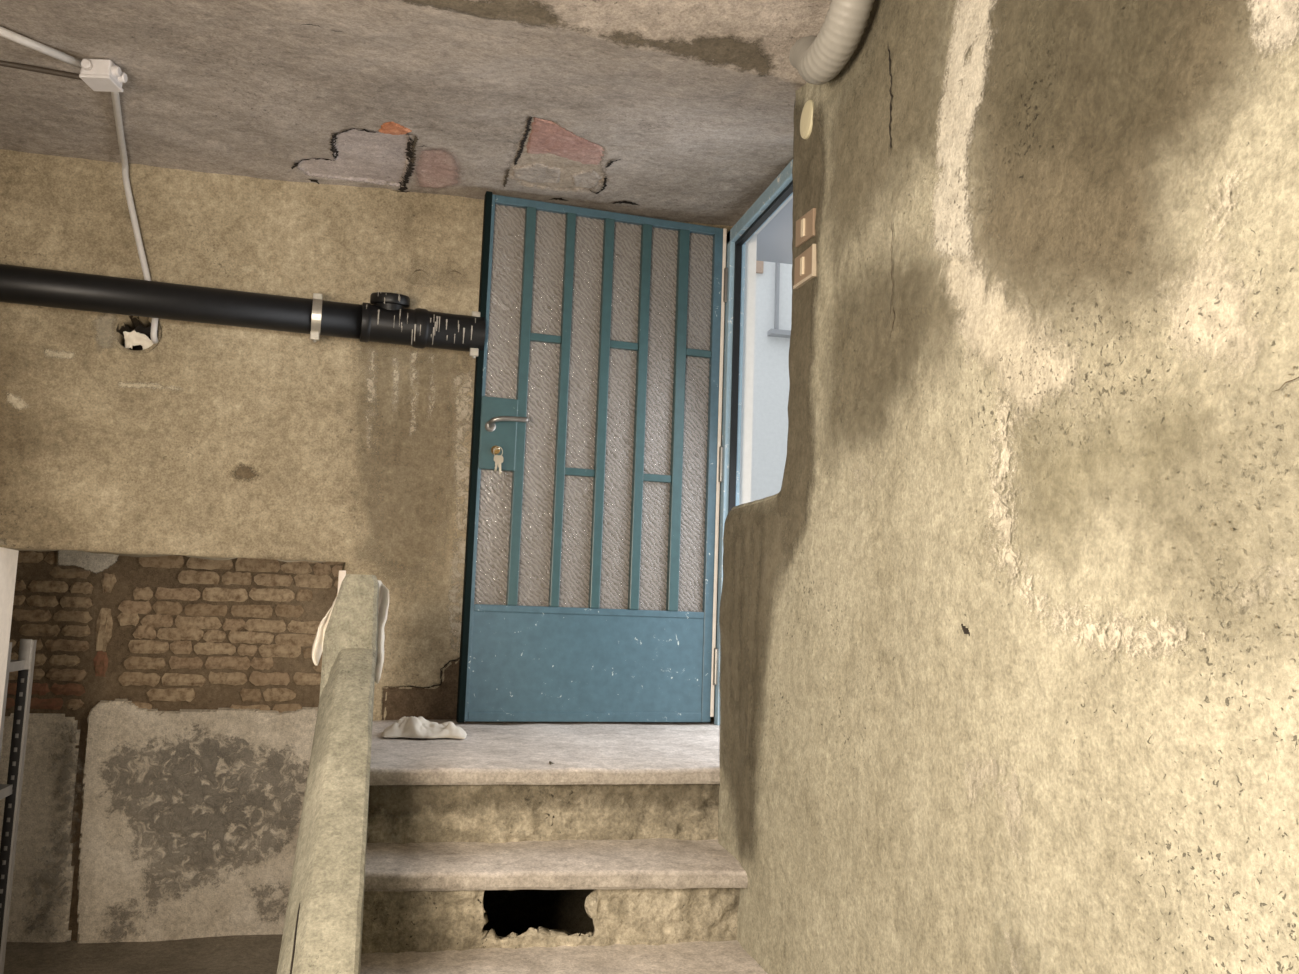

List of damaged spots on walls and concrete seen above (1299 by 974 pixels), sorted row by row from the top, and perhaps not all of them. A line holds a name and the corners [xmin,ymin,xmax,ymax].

spalling [291,122,459,192]
spalling [503,117,638,205]
damp [364,0,1250,854]
damp [100,724,309,942]